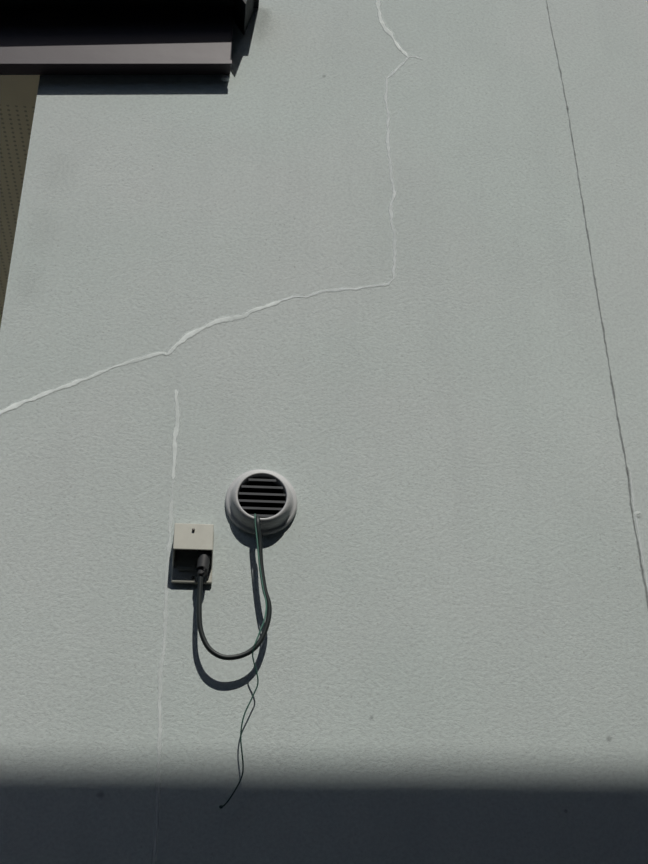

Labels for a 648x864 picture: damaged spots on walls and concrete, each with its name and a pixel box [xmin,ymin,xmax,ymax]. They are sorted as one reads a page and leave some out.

crack [0,0,422,415]
crack [167,390,180,560]
crack [152,581,168,864]